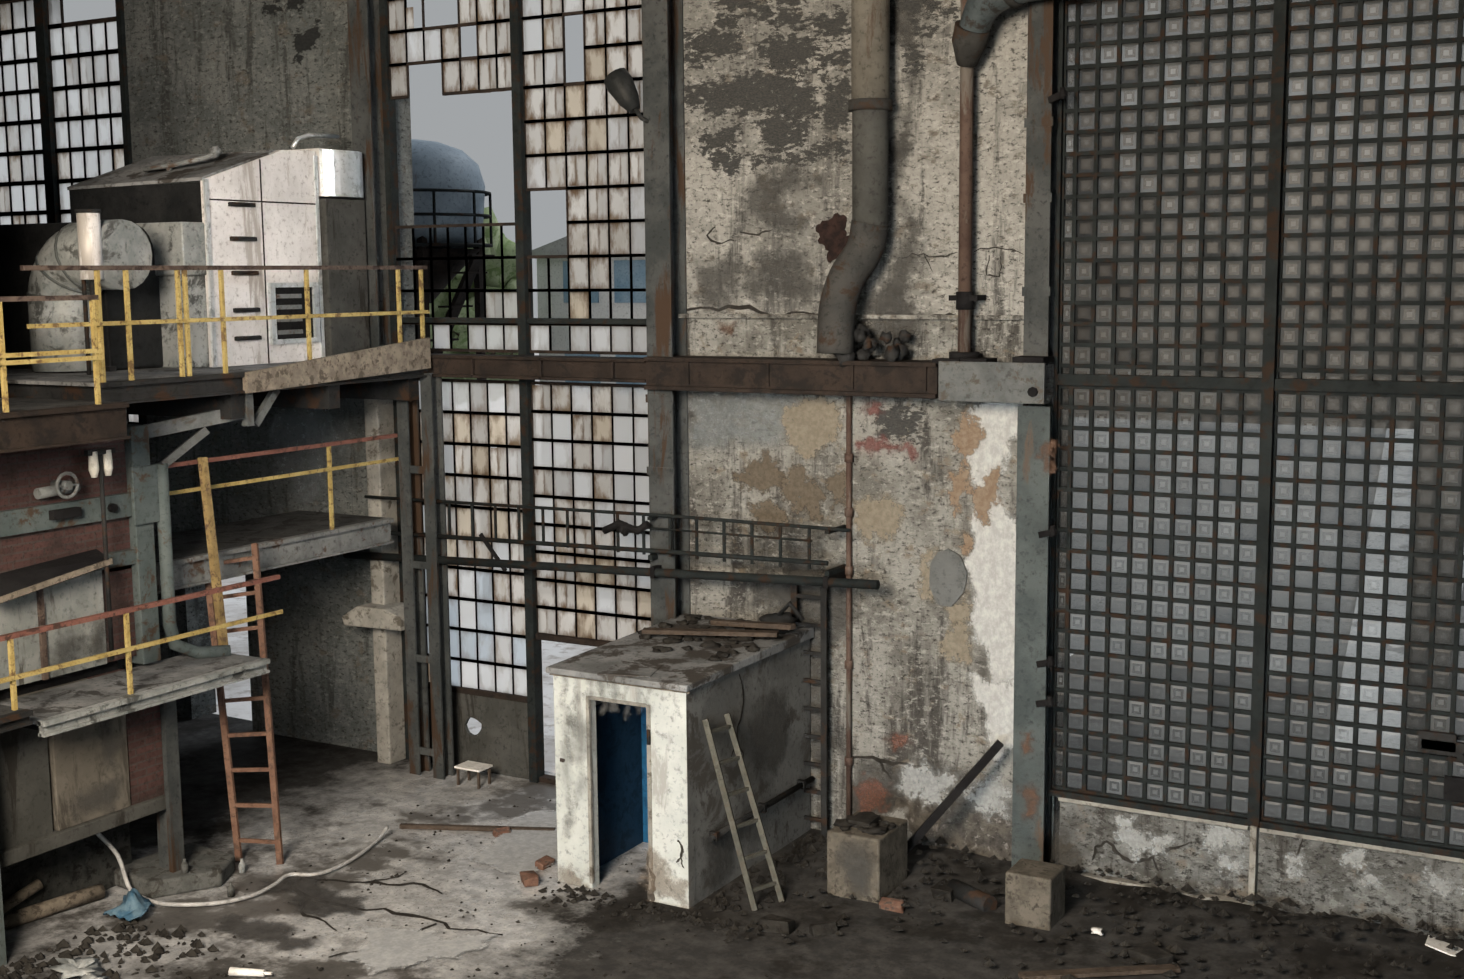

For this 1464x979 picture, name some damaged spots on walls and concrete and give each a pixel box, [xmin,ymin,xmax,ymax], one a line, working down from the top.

water stain [890,0,914,183]
water stain [739,163,822,230]
water stain [697,251,817,308]
water stain [855,217,917,352]
flaking render [867,397,928,447]
flaking render [731,395,906,544]
flaking render [917,411,1004,666]
spalling [852,778,1012,861]
crack [301,873,503,958]